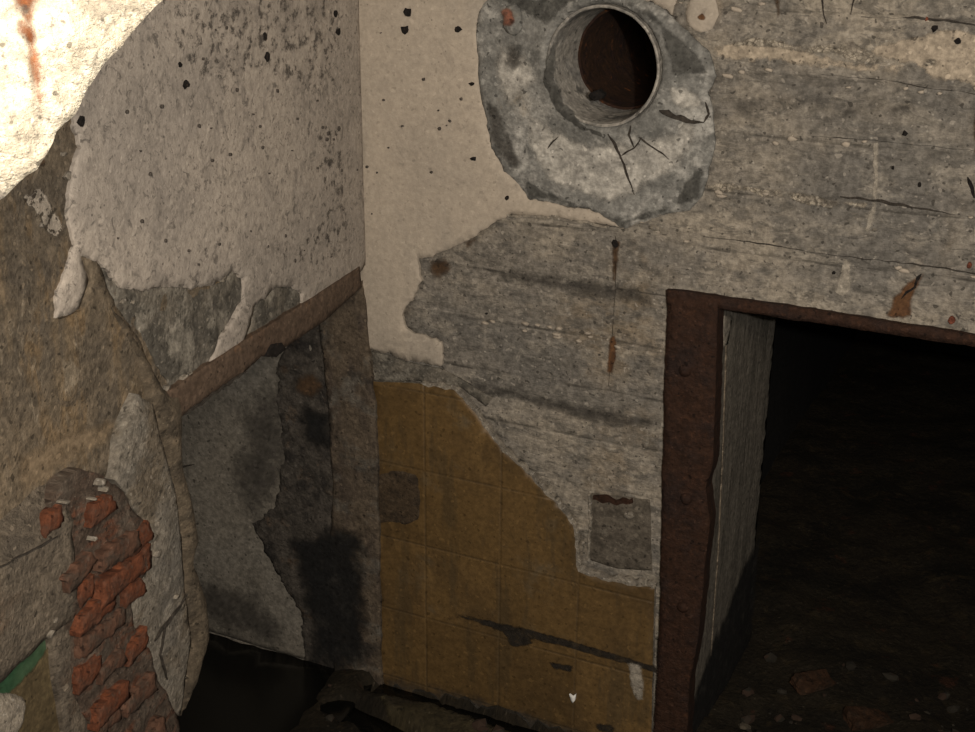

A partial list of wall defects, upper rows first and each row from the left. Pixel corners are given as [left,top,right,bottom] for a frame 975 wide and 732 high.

rust [17,0,41,103]
crack [659,102,710,124]
crack [608,126,667,195]
rust [611,240,619,280]
peeling [373,0,975,585]
rust [888,274,922,317]
rust [608,336,616,372]
peeling [0,119,242,732]
crack [0,536,59,568]